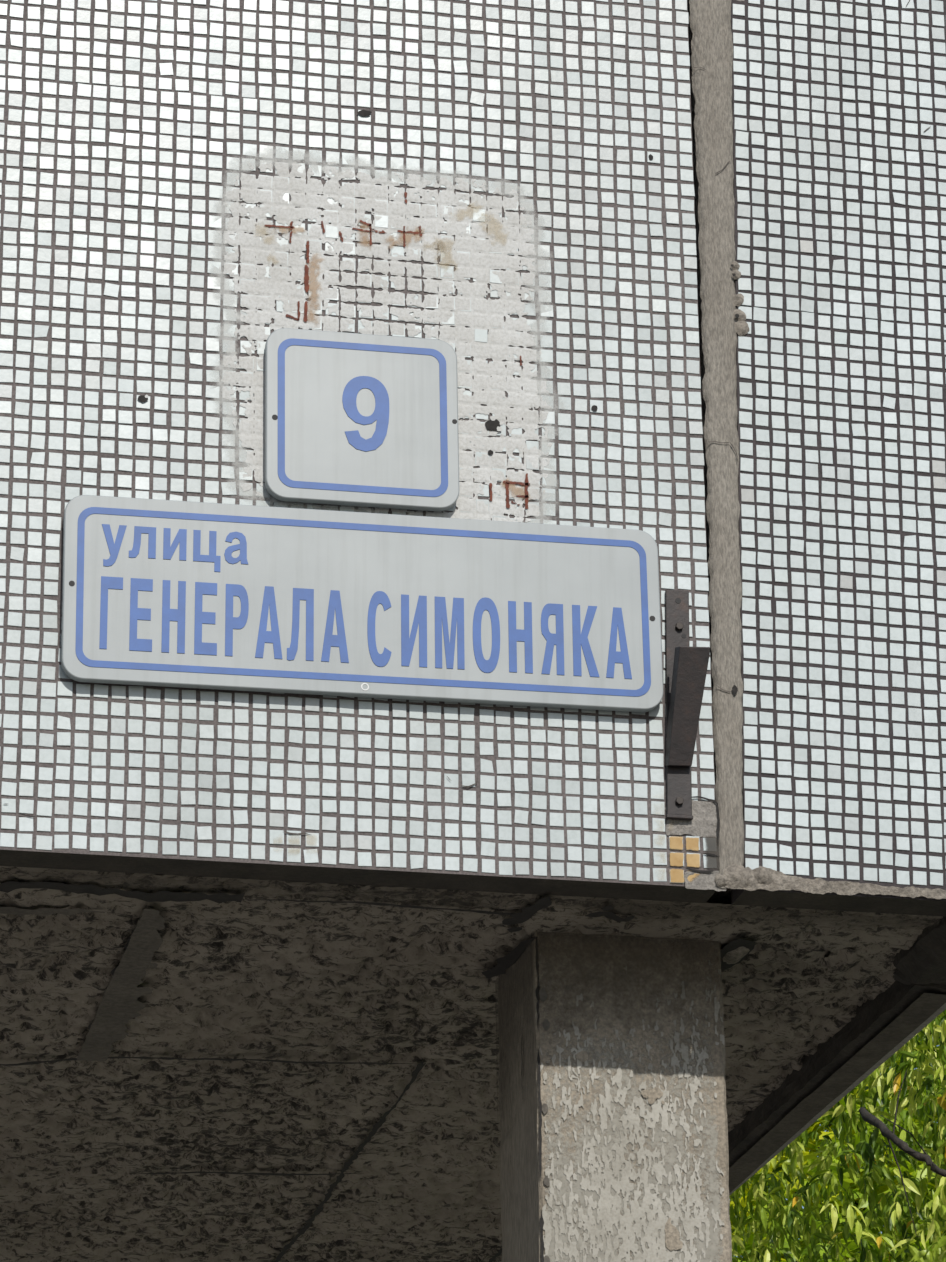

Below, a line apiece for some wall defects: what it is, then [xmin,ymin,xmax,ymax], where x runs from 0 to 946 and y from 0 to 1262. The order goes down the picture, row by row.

rust [265,221,319,322]
rust [321,220,422,247]
peeling [214,150,556,523]
rust [489,473,530,509]
peeling [666,796,946,899]